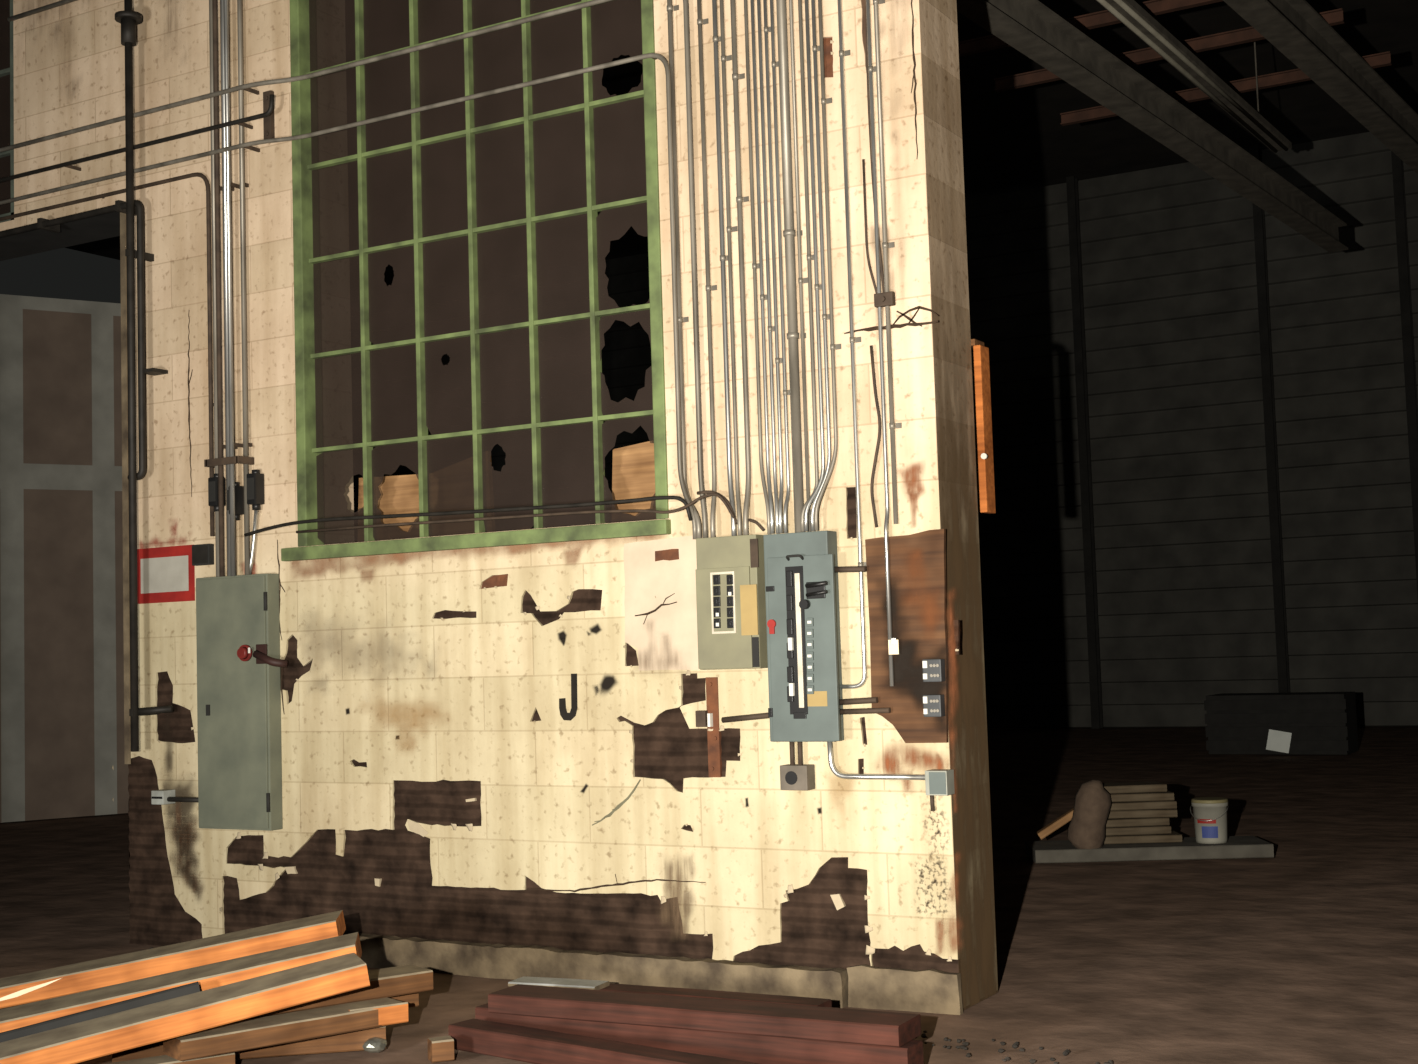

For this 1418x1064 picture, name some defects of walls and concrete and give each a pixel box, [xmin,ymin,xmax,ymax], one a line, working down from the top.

spalling [481,574,508,590]
spalling [522,589,602,626]
crack [635,593,677,624]
spalling [157,671,195,743]
spalling [280,635,313,704]
spalling [618,670,742,792]
corrosion [885,366,998,1011]
spalling [112,756,203,946]
leakage [169,787,198,891]
spalling [220,780,713,959]
crack [592,779,641,826]
spalling [734,857,959,973]